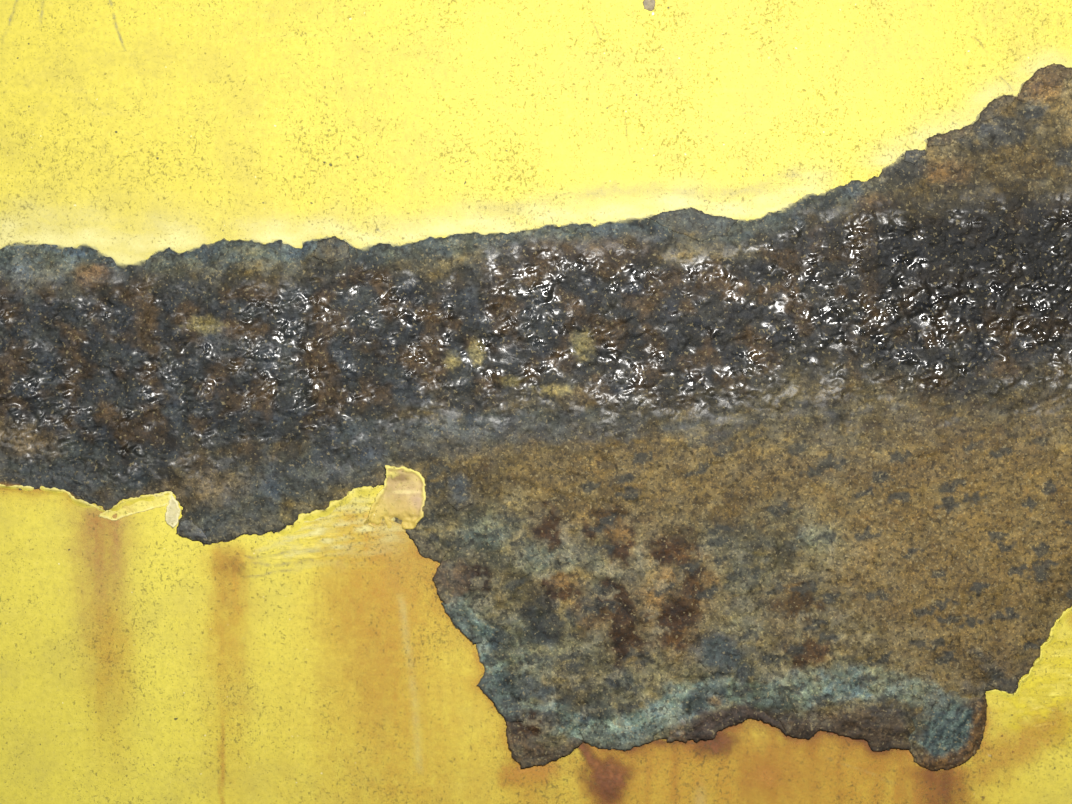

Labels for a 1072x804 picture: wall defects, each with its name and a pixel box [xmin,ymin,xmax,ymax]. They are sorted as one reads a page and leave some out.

rust [1017,63,1072,105]
rust [978,95,1016,122]
rust [649,207,739,242]
rust [311,236,352,264]
rust [19,458,106,504]
peeling [280,465,426,538]
rust [443,469,474,511]
rust [206,511,287,544]
rust [964,646,1018,695]
rust [506,721,583,769]
rust [778,700,913,751]
rust [908,690,988,771]